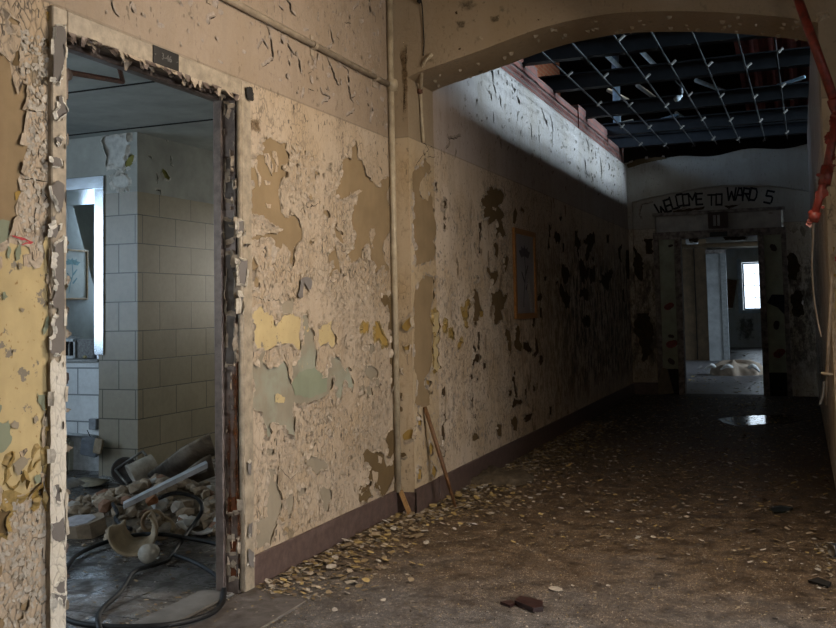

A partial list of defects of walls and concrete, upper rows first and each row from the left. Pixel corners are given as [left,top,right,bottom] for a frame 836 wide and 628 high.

crack [257,0,388,130]
peeling [0,16,243,628]
peeling [223,132,543,505]
peeling [544,212,613,309]
peeling [226,425,329,577]
peeling [271,483,503,585]
spalling [500,596,543,612]